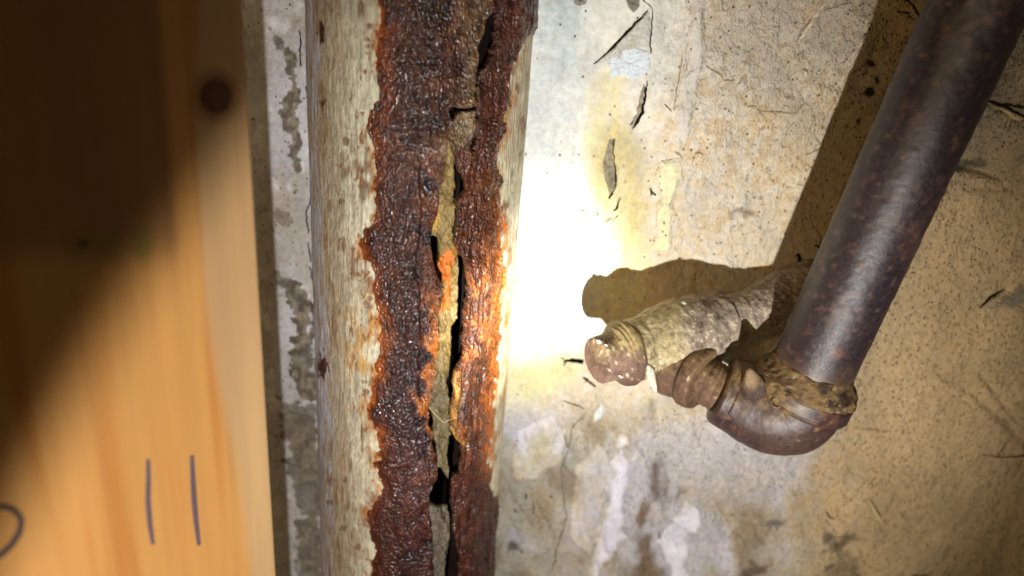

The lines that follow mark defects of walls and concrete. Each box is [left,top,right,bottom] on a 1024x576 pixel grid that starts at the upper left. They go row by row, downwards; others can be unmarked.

peeling [603,140,617,193]